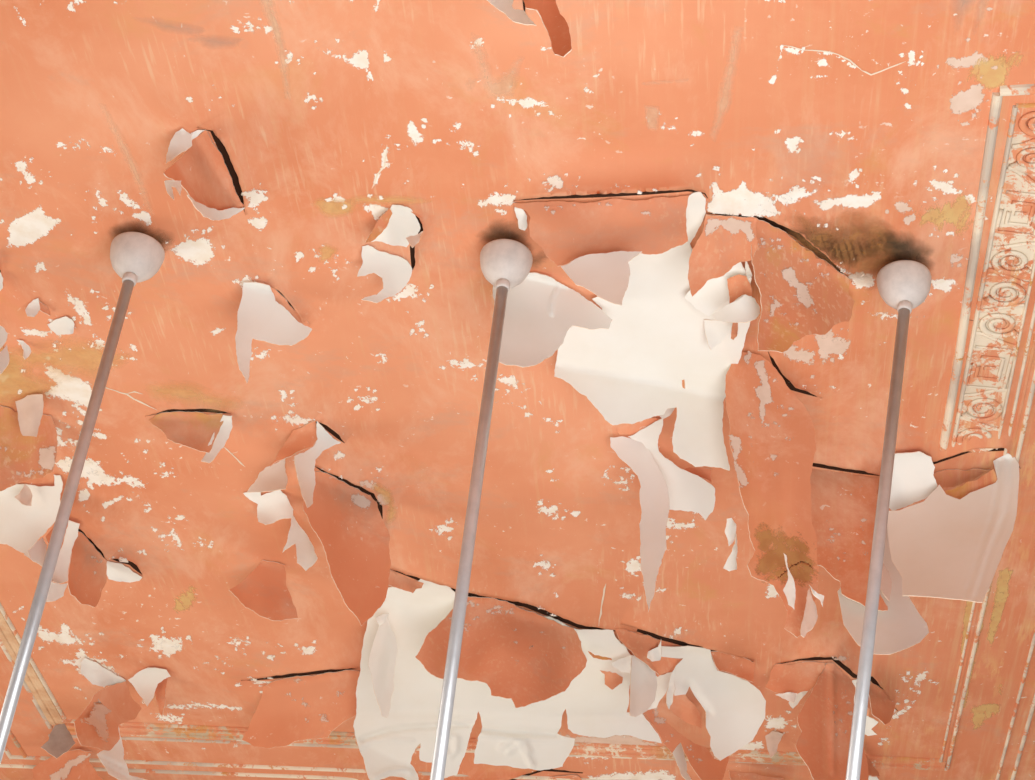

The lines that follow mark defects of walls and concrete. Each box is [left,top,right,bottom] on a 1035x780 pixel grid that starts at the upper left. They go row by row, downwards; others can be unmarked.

peeling [487,0,572,57]
flaking render [0,207,61,248]
flaking render [14,157,51,189]
flaking render [86,188,152,234]
peeling [163,128,271,267]
peeling [295,118,480,312]
flaking render [775,129,804,153]
leakage [805,226,890,270]
peeling [210,275,312,383]
peeling [0,289,178,607]
peeling [478,166,1019,655]
peeling [32,387,857,780]